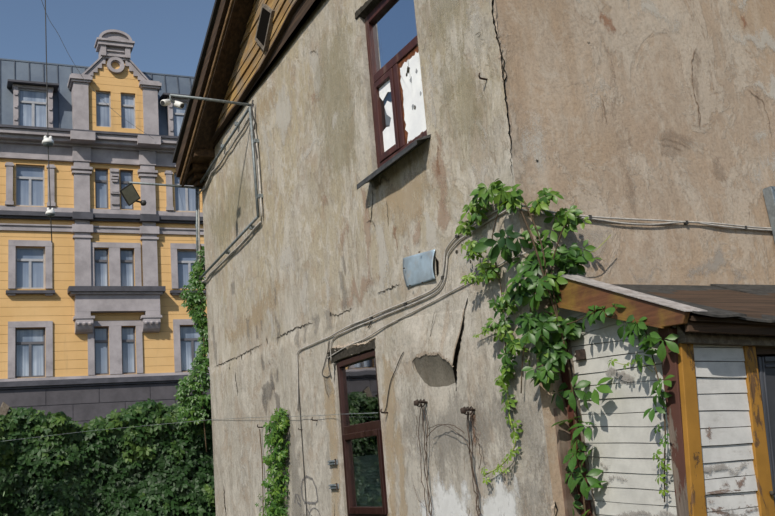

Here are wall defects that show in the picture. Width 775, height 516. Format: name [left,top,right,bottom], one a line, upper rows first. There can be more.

crack [477,0,513,178]
crack [214,322,312,396]
crack [452,298,468,391]
crack [550,501,558,516]